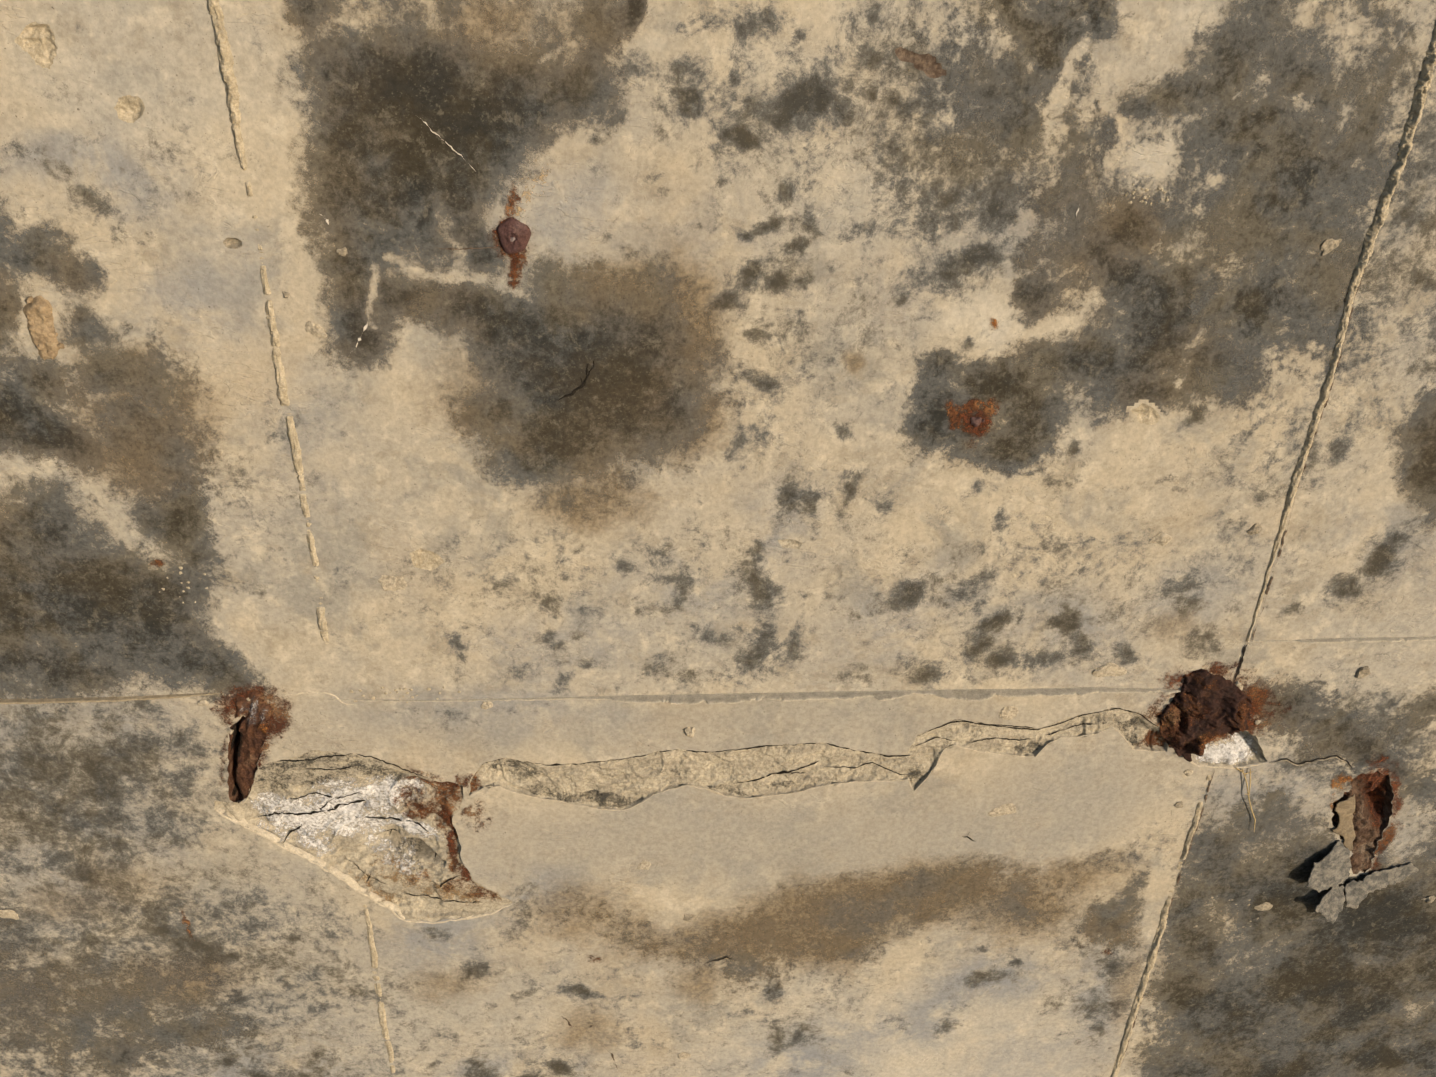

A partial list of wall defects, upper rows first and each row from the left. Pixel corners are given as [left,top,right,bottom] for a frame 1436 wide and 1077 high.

corrosion [488,186,527,289]
leakage [284,0,745,517]
leakage [900,0,1419,476]
leakage [0,197,267,709]
corrosion [945,398,999,448]
leakage [1392,388,1436,528]
spalling [197,683,1171,925]
leakage [557,849,1150,987]
corrosion [1144,661,1291,762]
leakage [1130,677,1436,1077]
spalling [1190,730,1419,924]